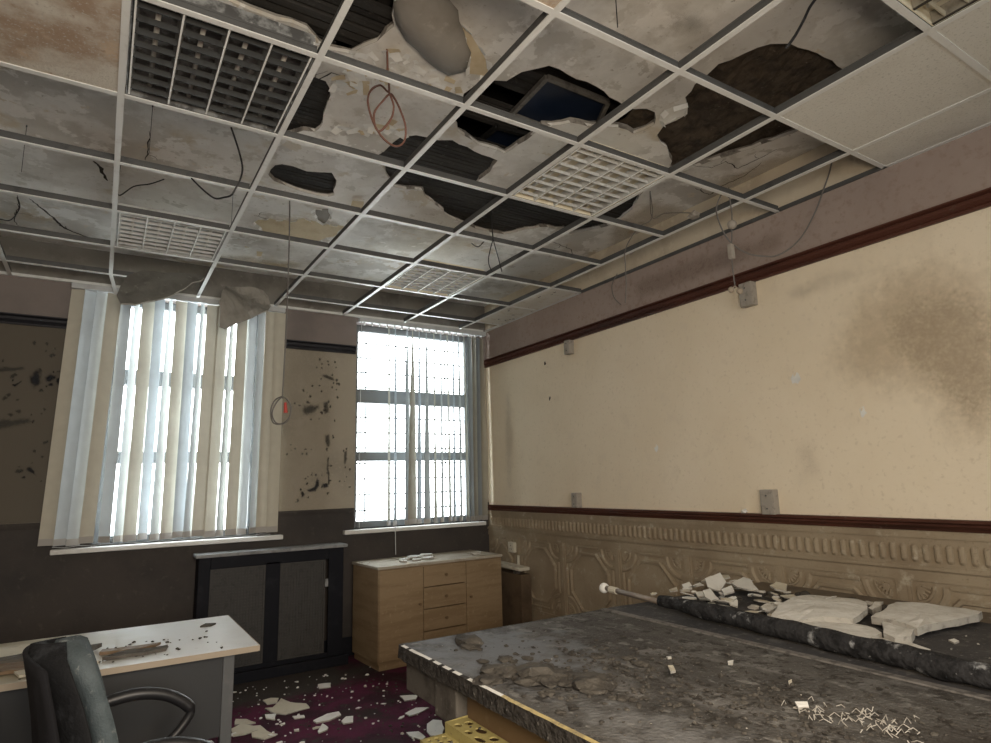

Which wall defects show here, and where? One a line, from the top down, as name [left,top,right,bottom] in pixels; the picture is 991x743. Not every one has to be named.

flaking render [253,209,344,242]
flaking render [232,0,842,234]